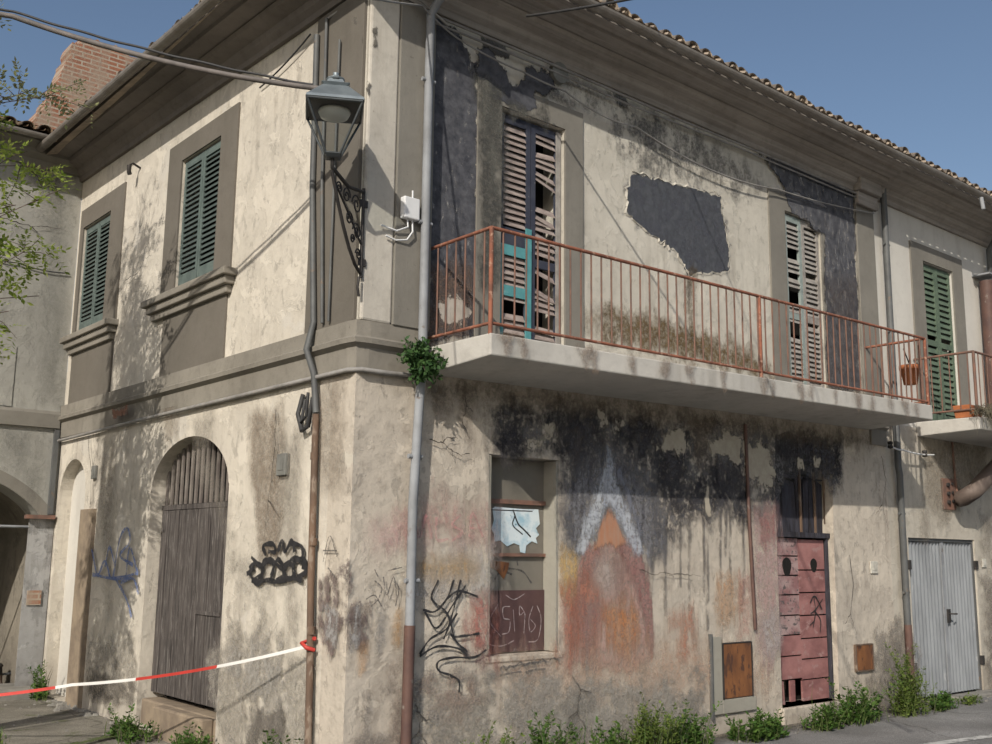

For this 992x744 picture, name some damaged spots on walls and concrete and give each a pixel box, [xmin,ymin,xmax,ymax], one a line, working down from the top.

peeling [427,18,556,347]
peeling [624,170,731,299]
leakage [614,94,751,194]
peeling [759,154,860,391]
crack [429,391,473,460]